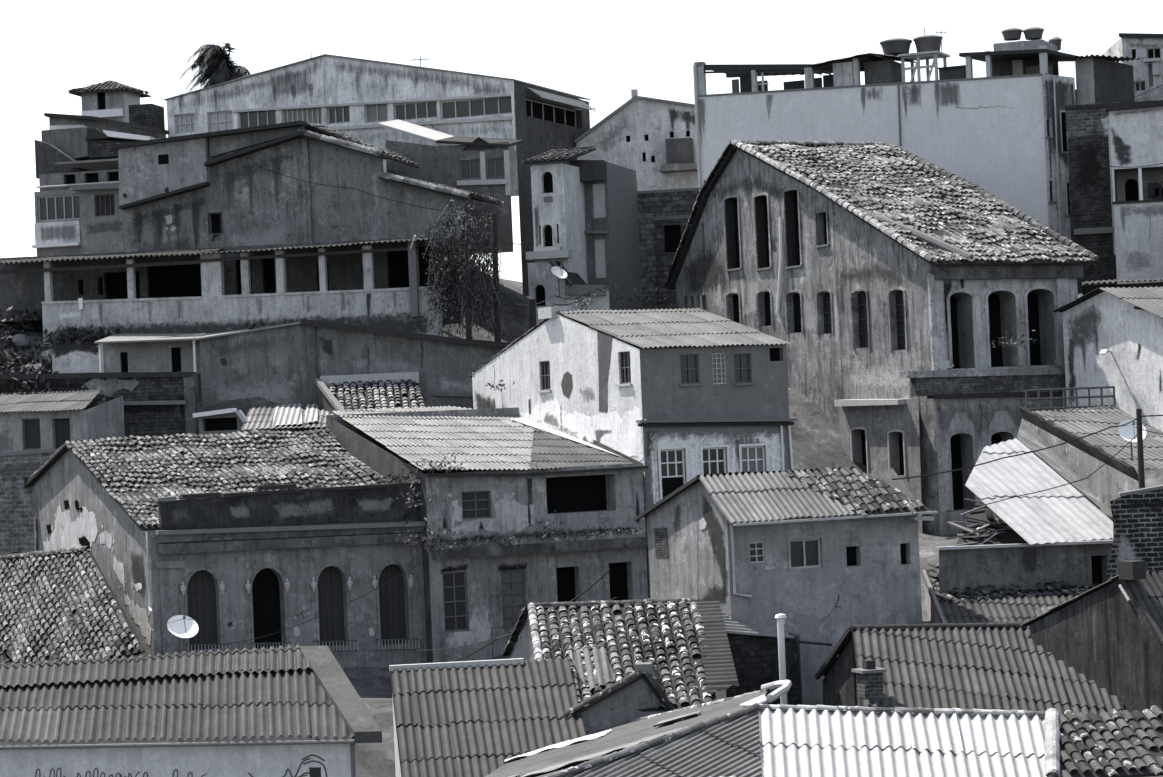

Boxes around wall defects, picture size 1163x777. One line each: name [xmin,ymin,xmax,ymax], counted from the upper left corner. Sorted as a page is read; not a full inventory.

damp [902,85,920,112]
damp [935,83,958,113]
peeling [520,397,646,462]
peeling [21,498,153,645]